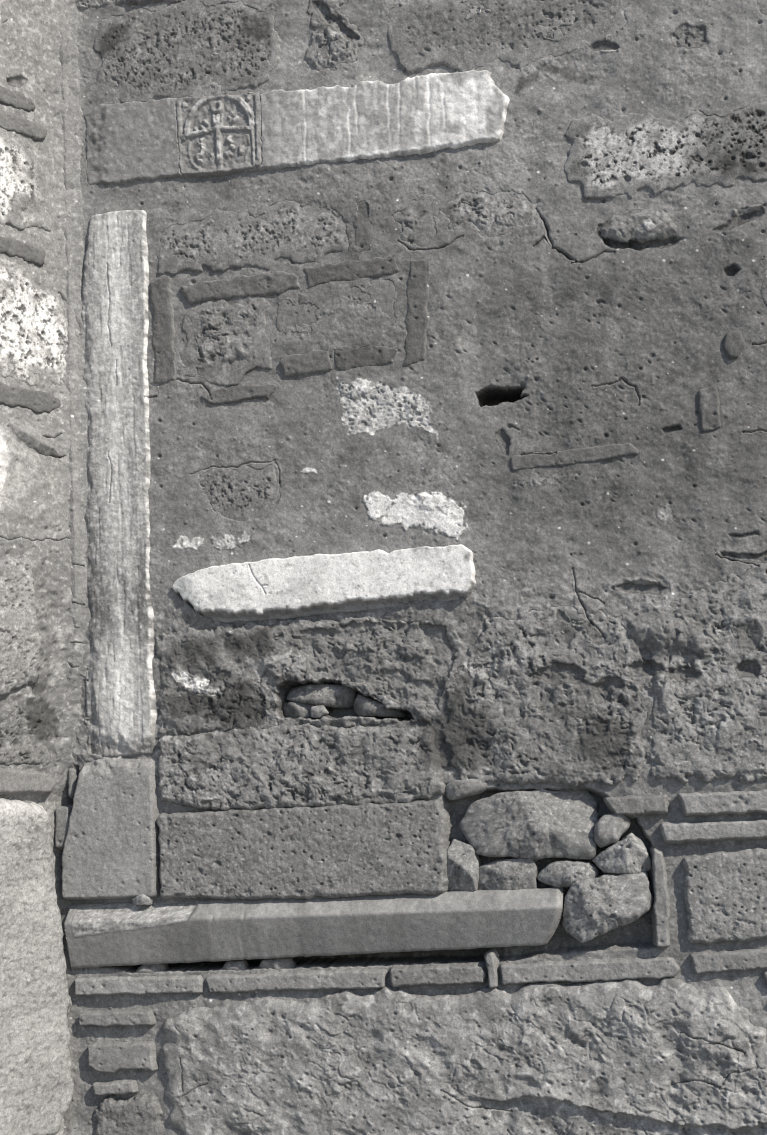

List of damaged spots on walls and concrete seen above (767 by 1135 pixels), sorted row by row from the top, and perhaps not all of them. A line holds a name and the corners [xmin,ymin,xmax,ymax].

crack [533,209,614,265]
crack [753,339,767,347]
peeling [336,378,439,441]
peeling [363,491,468,540]
crack [571,569,606,639]